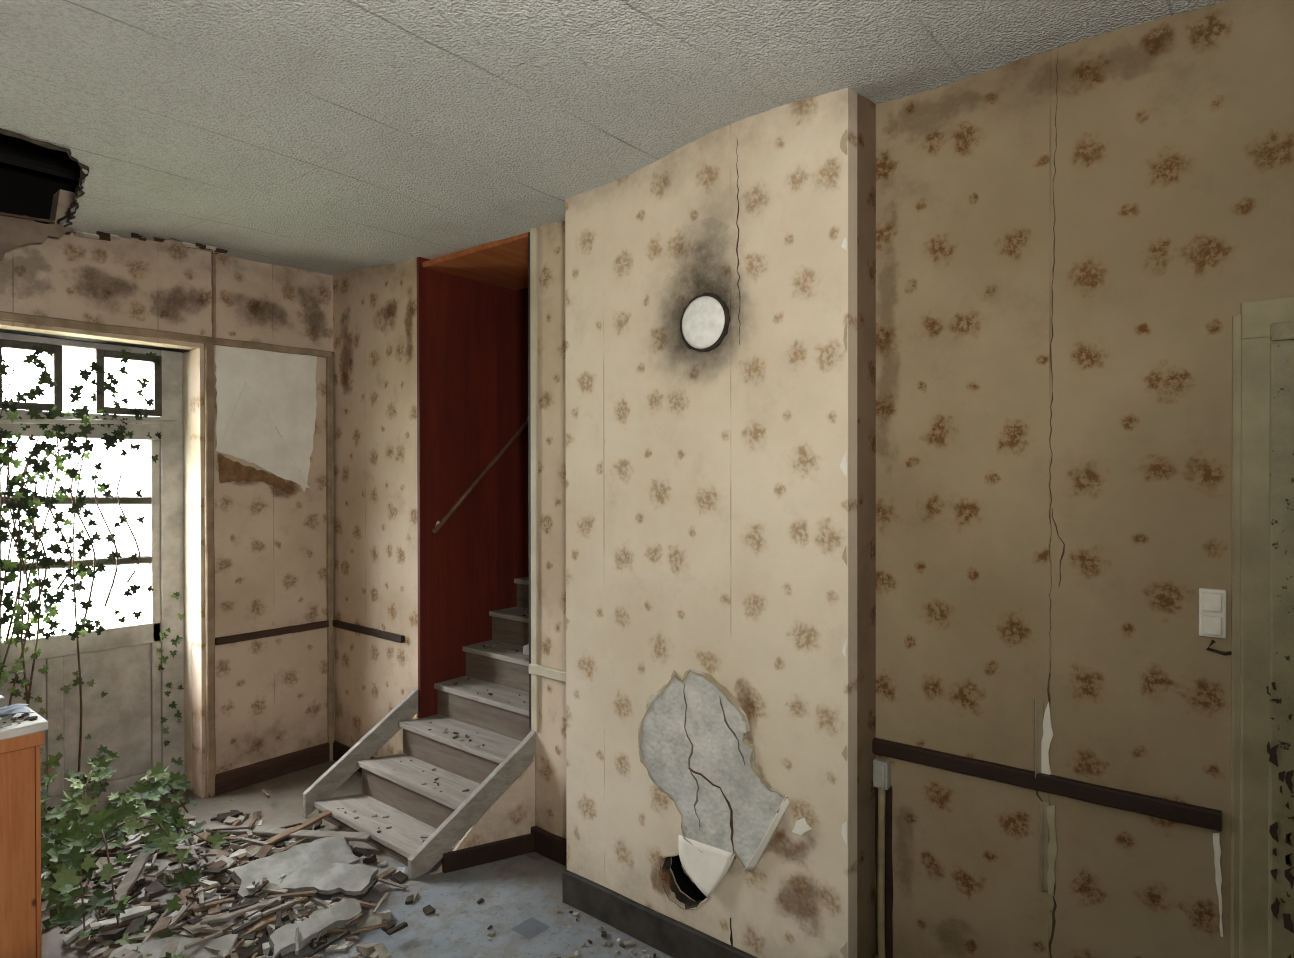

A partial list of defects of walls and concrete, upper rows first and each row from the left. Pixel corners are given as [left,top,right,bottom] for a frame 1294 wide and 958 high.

crack [1047,57,1065,706]
spalling [638,668,812,910]
crack [1048,885,1057,958]